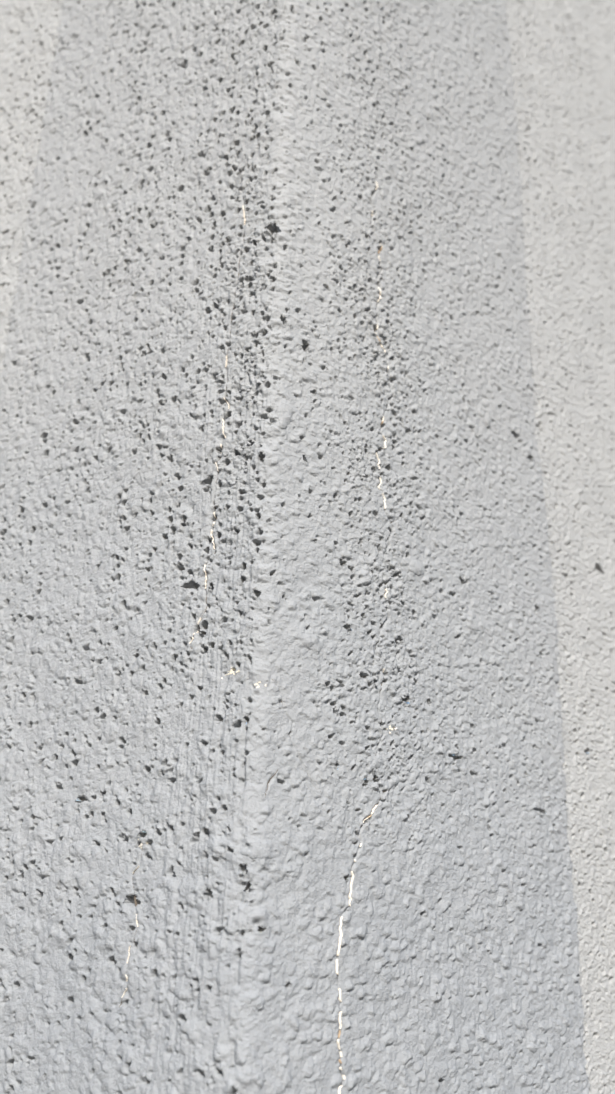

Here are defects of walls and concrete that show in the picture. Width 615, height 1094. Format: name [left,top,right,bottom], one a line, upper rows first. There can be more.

crack [370,181,402,540]
crack [336,752,390,1094]